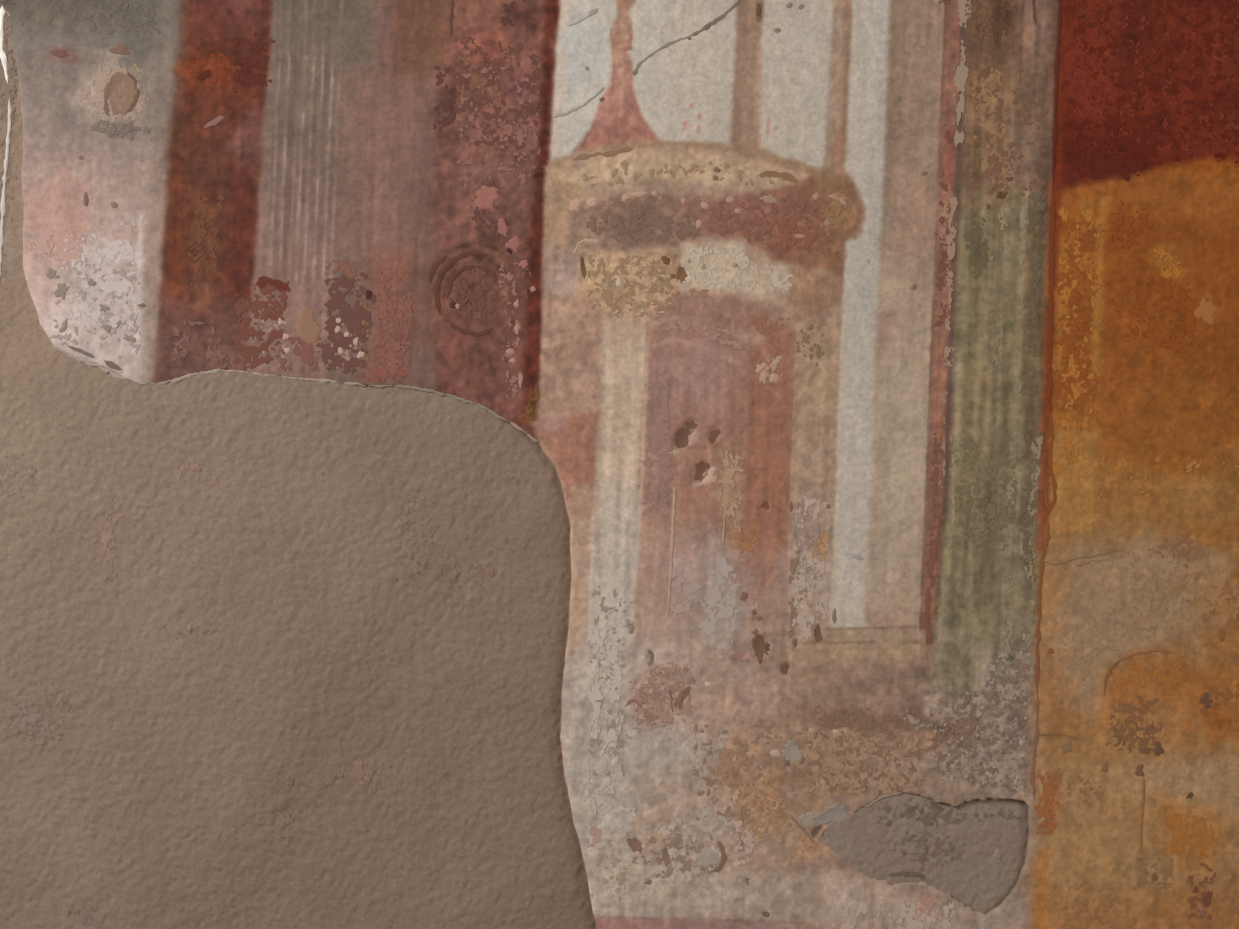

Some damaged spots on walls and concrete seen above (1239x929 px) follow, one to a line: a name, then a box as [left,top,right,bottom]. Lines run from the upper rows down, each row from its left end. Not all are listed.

crack [569,8,598,26]
crack [634,0,740,72]
crack [553,87,605,118]
peeling [433,37,543,403]
peeling [933,0,1050,331]
peeling [170,272,376,377]
peeling [581,204,1102,917]
peeling [582,586,711,776]
spalling [1043,695,1166,806]